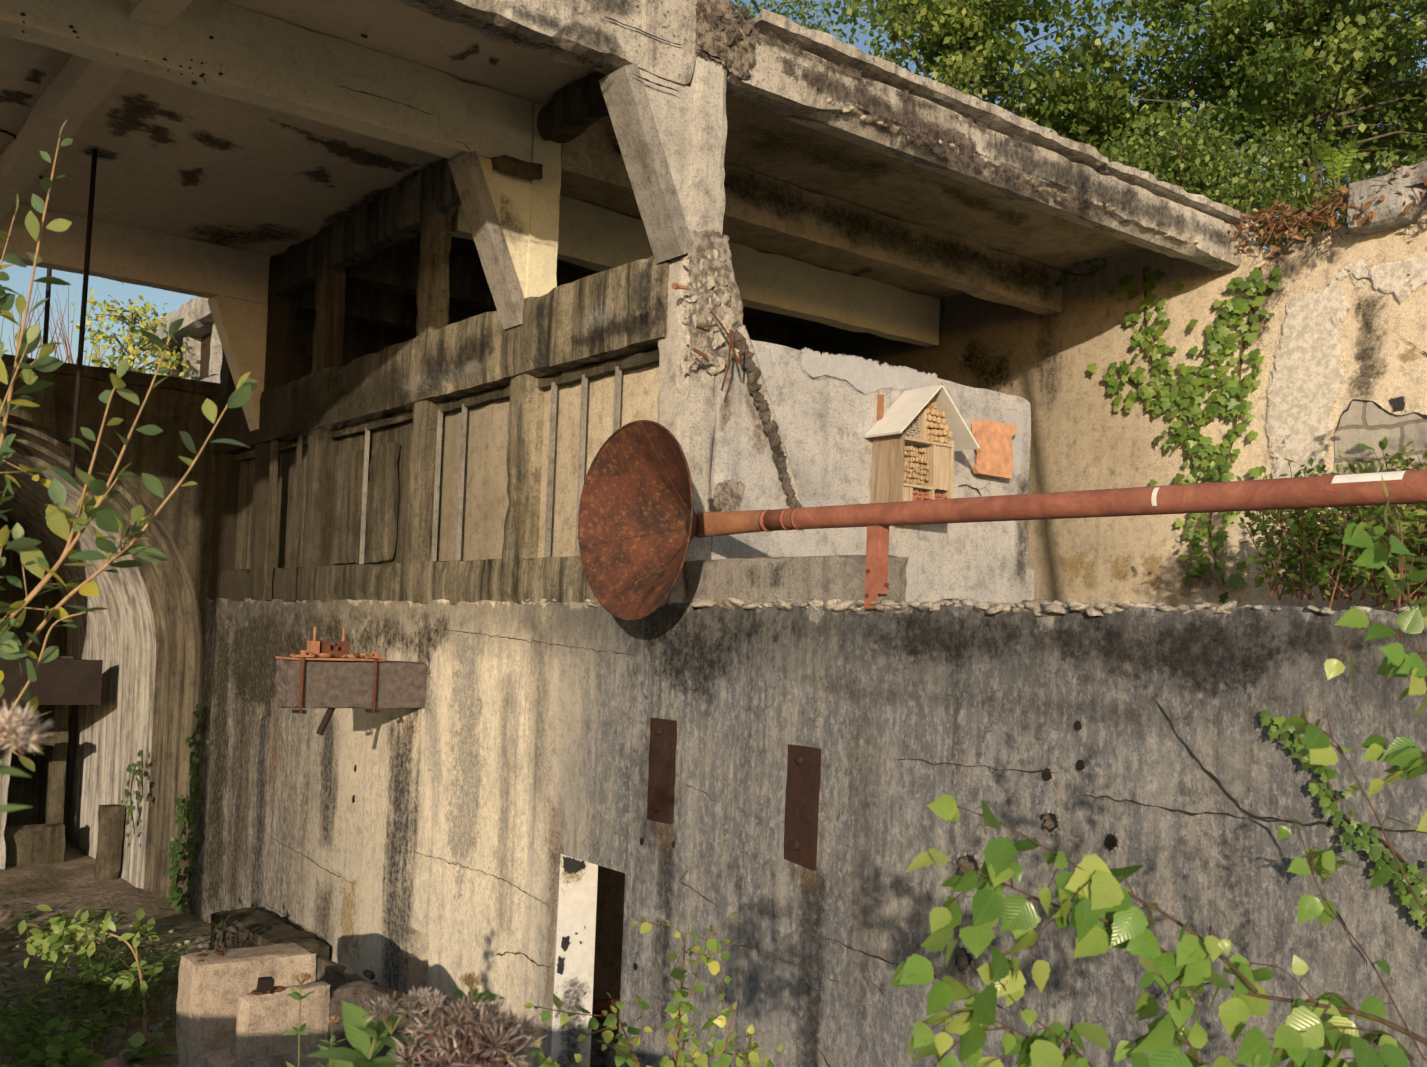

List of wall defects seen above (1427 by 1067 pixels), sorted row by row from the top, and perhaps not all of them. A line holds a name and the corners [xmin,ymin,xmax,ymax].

damp [749,25,1230,246]
spalling [679,230,774,391]
peeling [800,348,938,396]
damp [724,169,1055,299]
peeling [1000,408,1026,477]
peeling [1264,256,1427,479]
damp [646,615,794,701]
damp [204,612,482,991]
crack [897,697,1427,867]